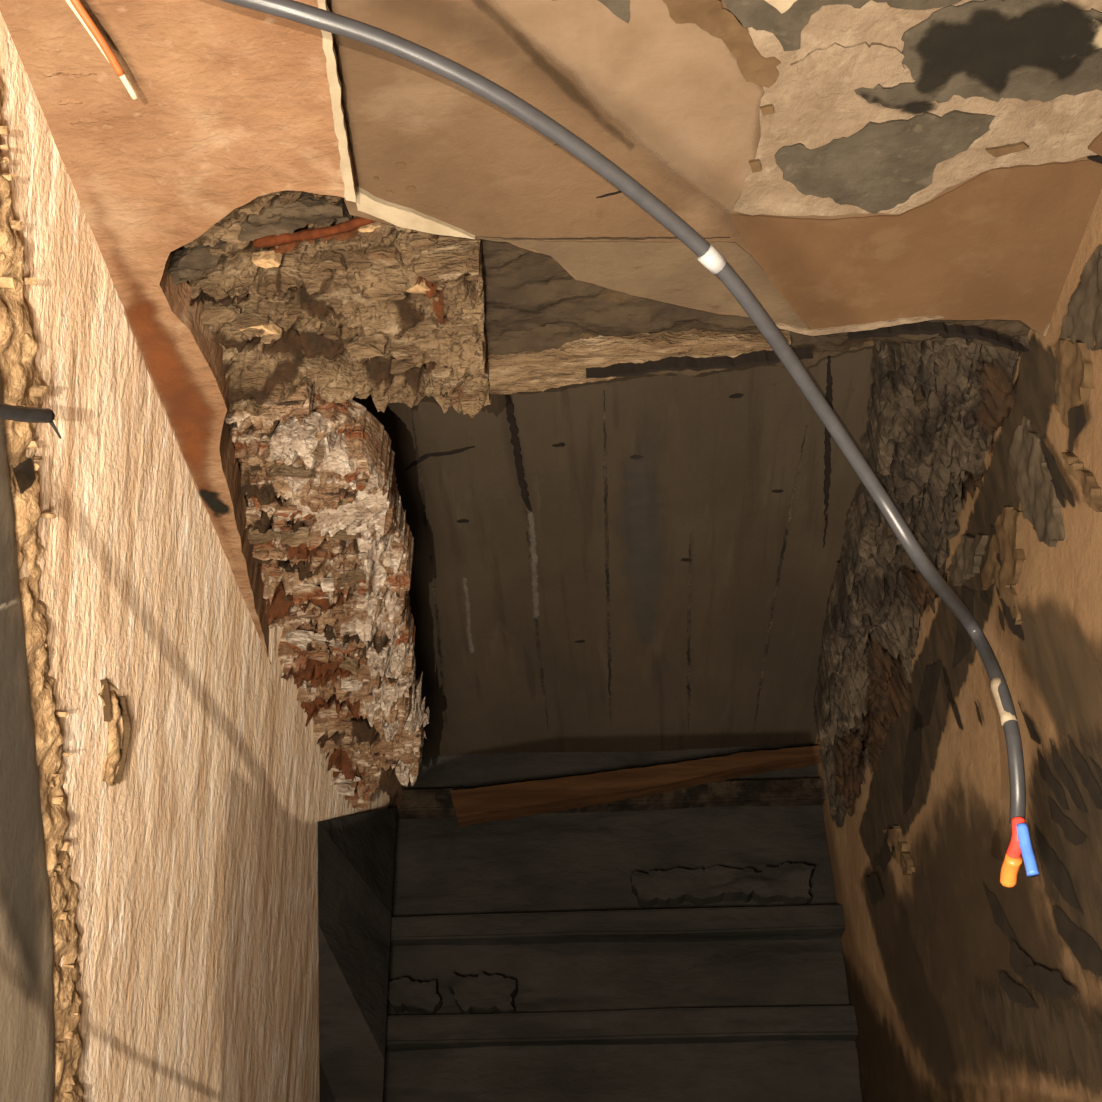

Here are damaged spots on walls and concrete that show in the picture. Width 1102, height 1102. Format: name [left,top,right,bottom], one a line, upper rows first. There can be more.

spalling [598,0,630,23]
spalling [167,30,784,810]
peeling [663,0,1102,631]
peeling [98,679,131,787]
spalling [812,482,939,906]